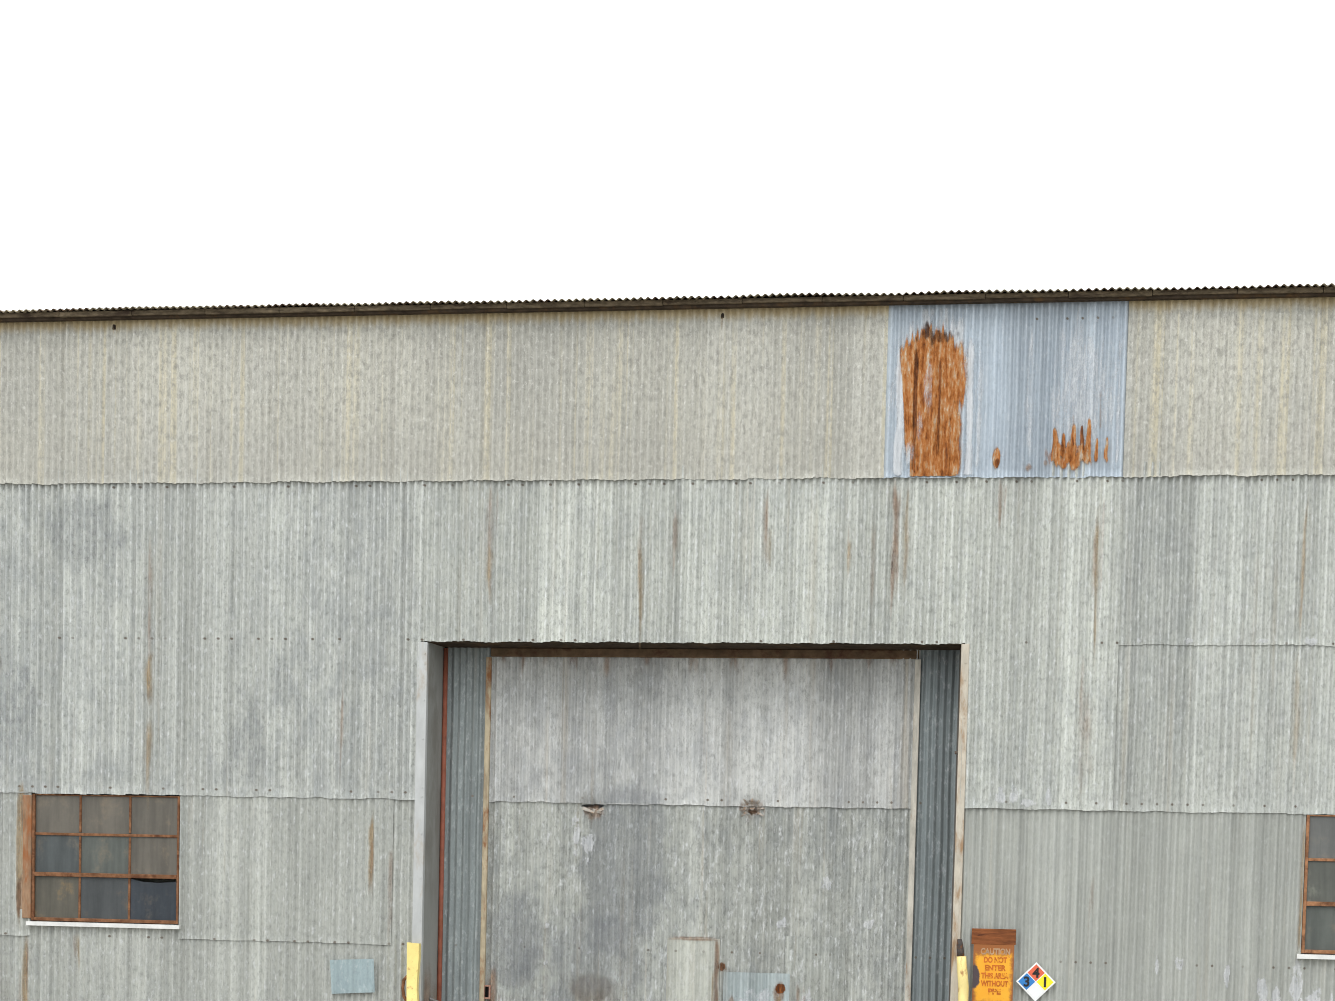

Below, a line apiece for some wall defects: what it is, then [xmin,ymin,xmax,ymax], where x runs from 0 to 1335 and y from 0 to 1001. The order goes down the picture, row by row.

rust [891,308,974,476]
rust [1051,339,1112,470]